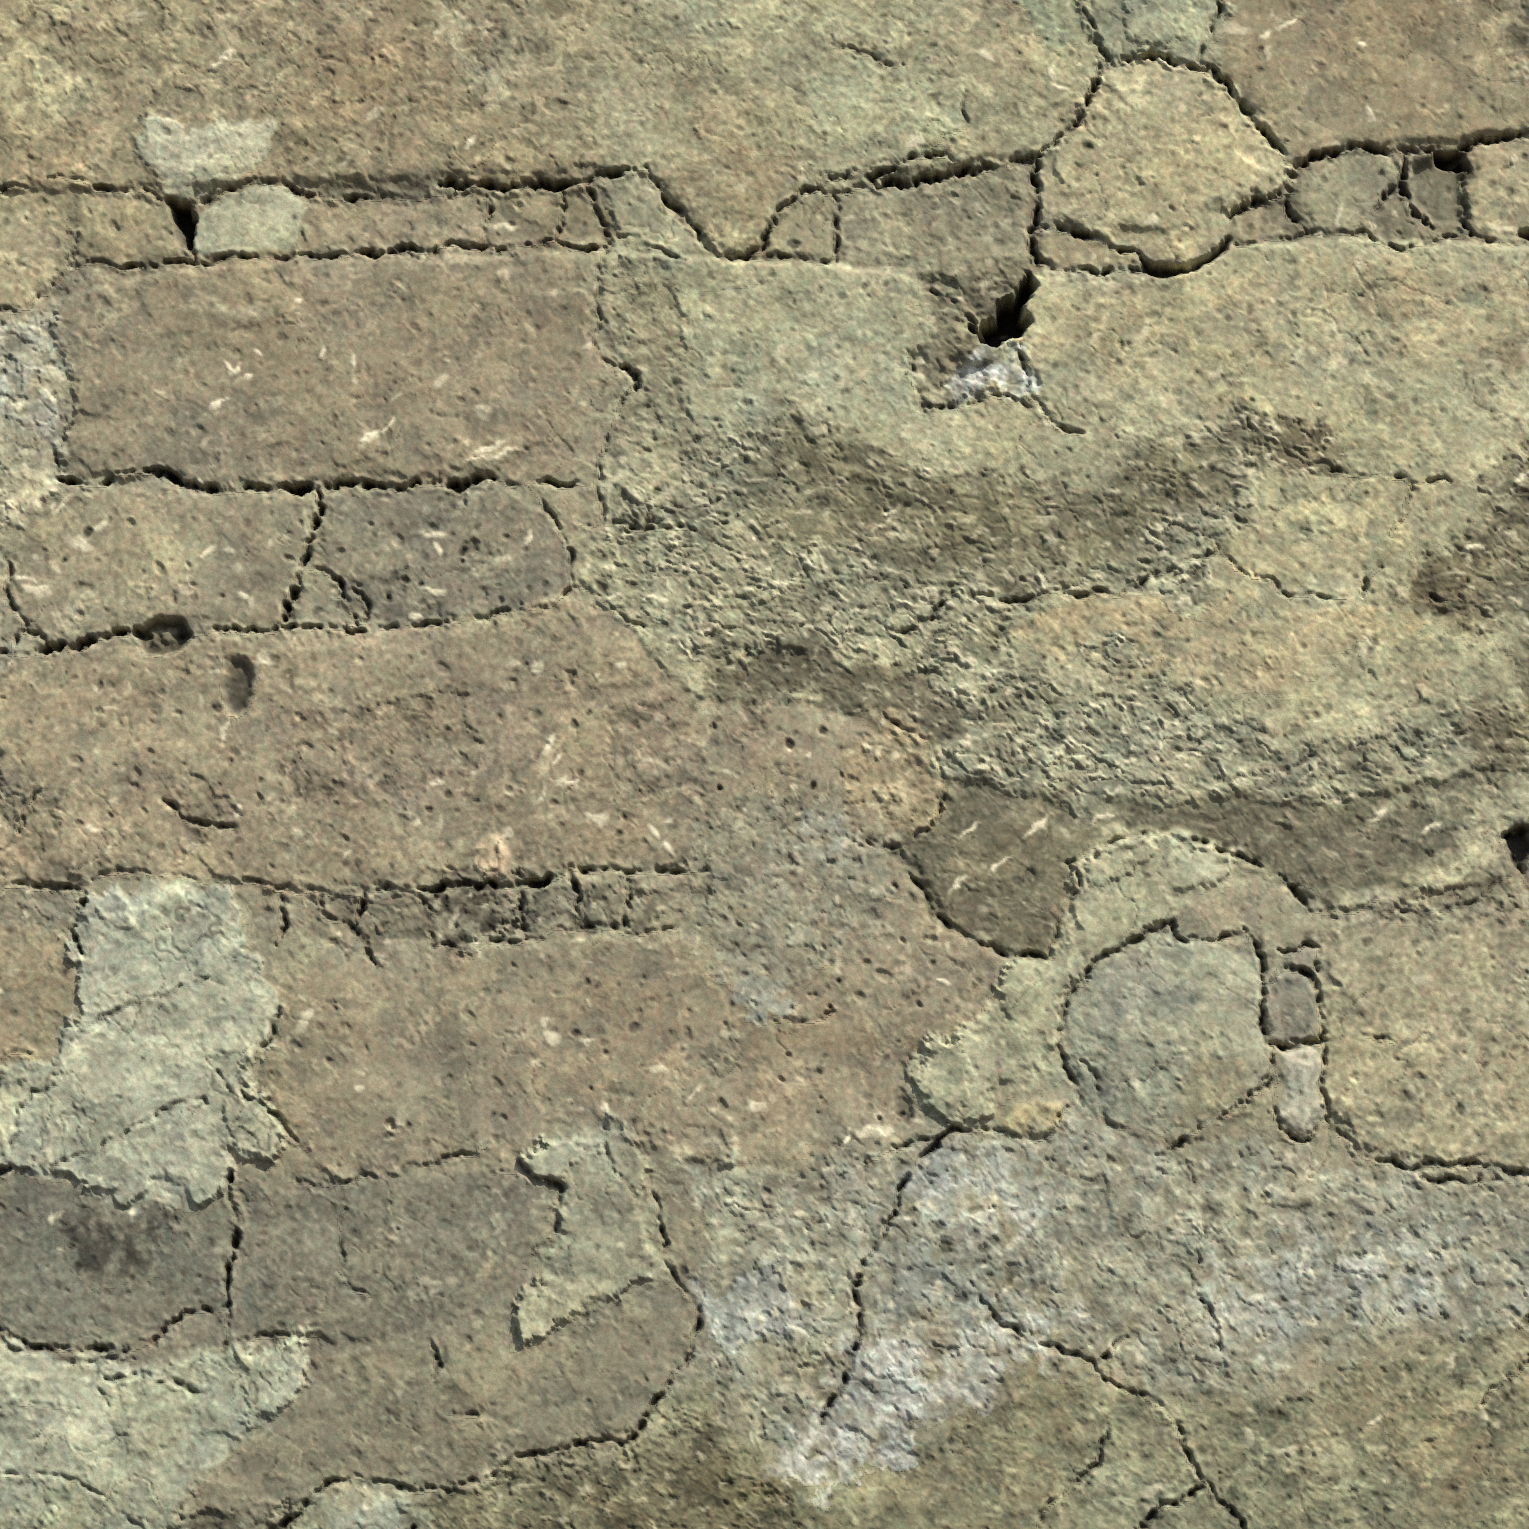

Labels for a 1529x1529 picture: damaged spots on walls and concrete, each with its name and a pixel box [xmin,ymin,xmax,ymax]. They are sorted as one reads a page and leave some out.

crack [0,0,1529,640]
spalling [898,252,1046,419]
crack [0,555,139,658]
flaking render [0,873,291,1220]
crack [161,798,237,831]
crack [0,864,708,965]
crack [774,1010,833,1026]
spalling [572,385,1529,1137]
crack [817,712,1529,1426]
flaking render [507,1109,677,1353]
flaking render [0,1319,838,1529]
crack [969,1282,1247,1529]